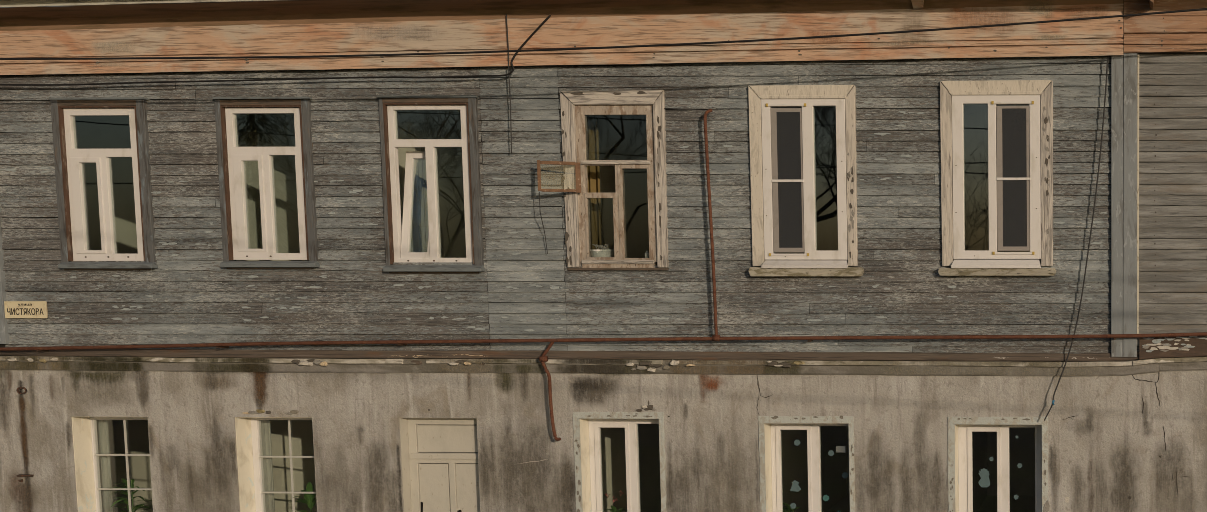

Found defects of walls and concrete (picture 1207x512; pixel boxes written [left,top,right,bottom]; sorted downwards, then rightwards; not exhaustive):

peeling [1142,336,1207,352]
corrosion [18,381,33,512]
water stain [563,462,575,512]